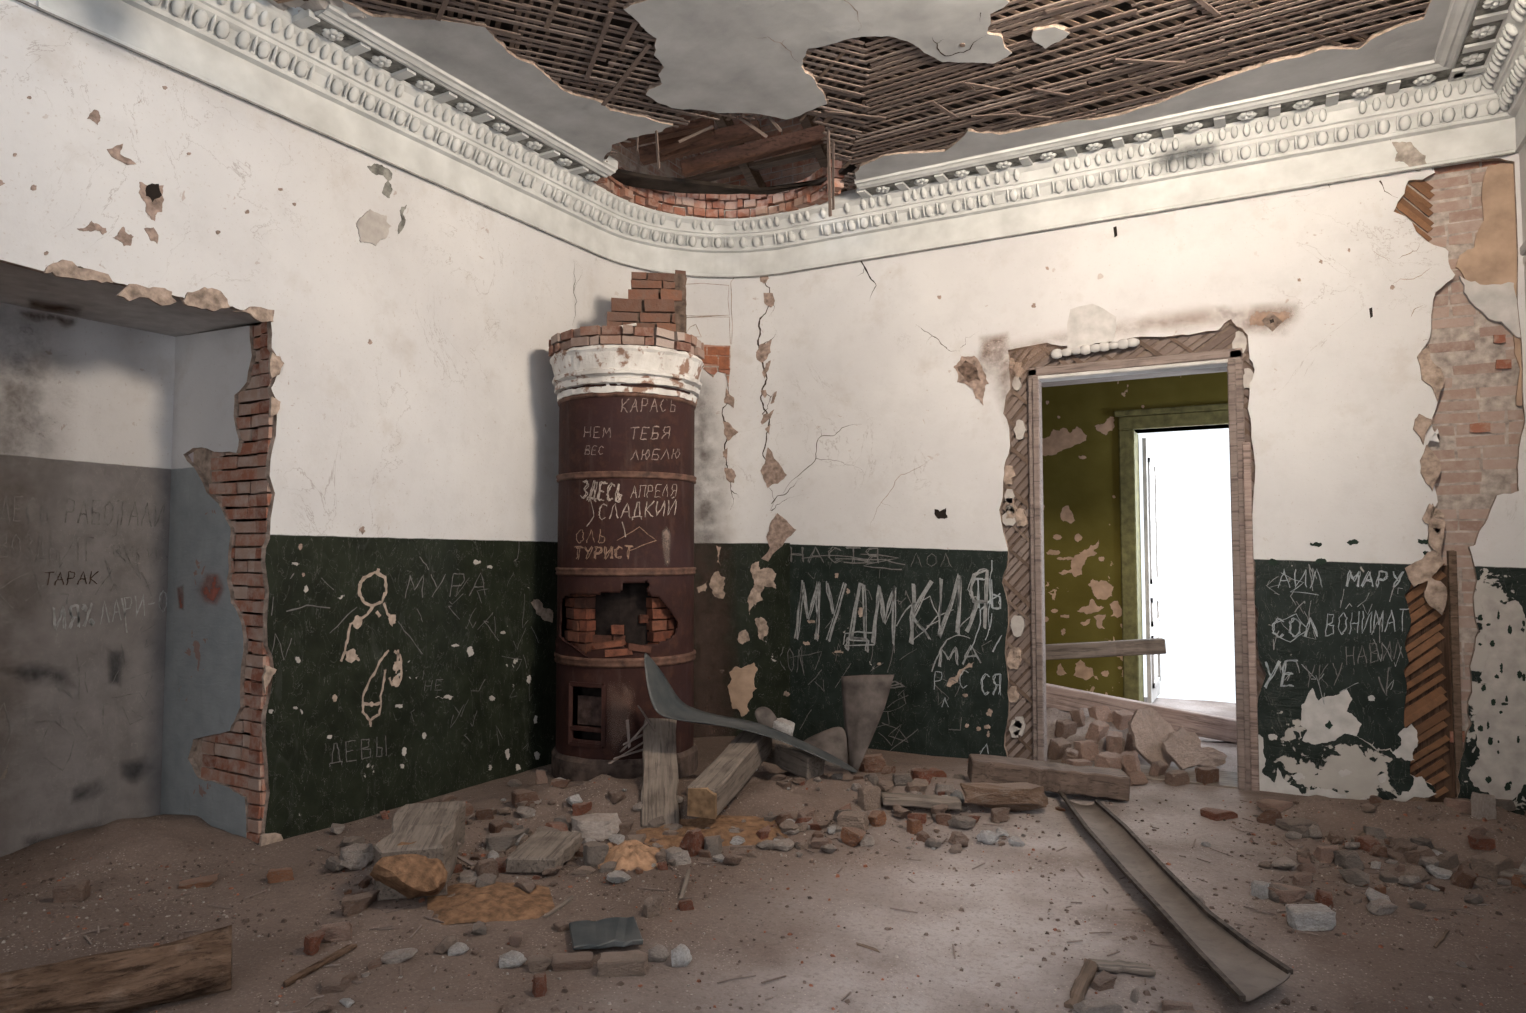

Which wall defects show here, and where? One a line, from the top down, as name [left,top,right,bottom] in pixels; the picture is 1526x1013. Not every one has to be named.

spalling [267,0,1430,219]
crack [686,276,929,561]
spalling [954,356,989,405]
spalling [1262,312,1282,332]
spalling [44,251,284,846]
spalling [965,320,1255,760]
spalling [1254,558,1278,703]
peeling [1256,734,1387,812]
peeling [1300,688,1375,745]